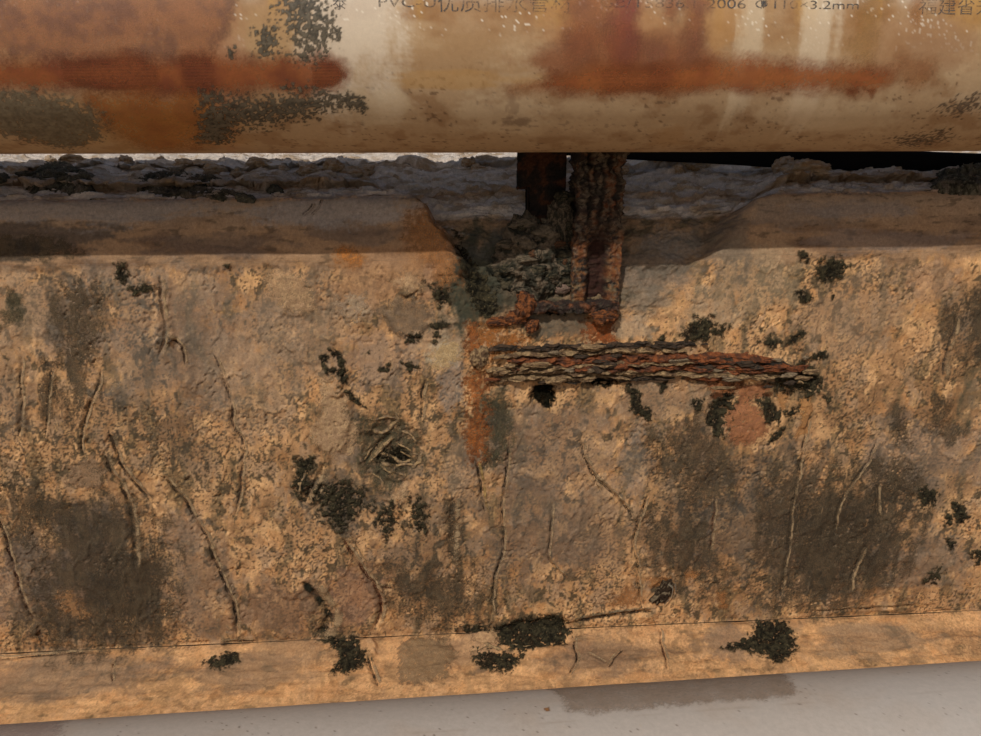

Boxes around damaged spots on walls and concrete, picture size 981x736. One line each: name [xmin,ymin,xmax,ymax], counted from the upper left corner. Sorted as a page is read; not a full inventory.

leakage [0,470,185,664]
crack [80,357,253,645]
crack [303,582,343,639]
crack [448,447,511,613]
spalling [530,384,556,410]
spalling [586,378,621,389]
crack [570,444,650,672]
corrosion [460,290,820,469]
leakage [636,412,741,596]
peeling [707,380,788,446]
leakage [748,400,931,620]
leakage [930,393,969,448]